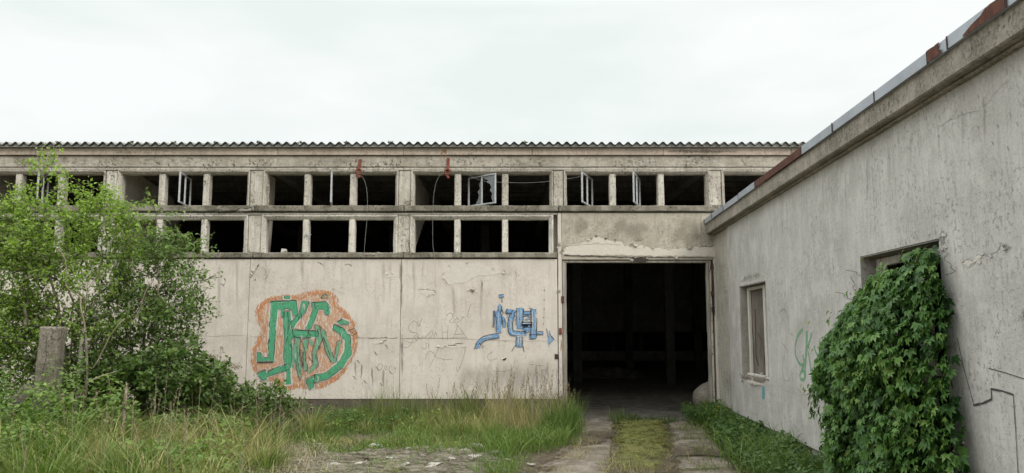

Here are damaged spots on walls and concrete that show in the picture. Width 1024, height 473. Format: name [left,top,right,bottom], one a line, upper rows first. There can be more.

peeling [557,235,715,261]